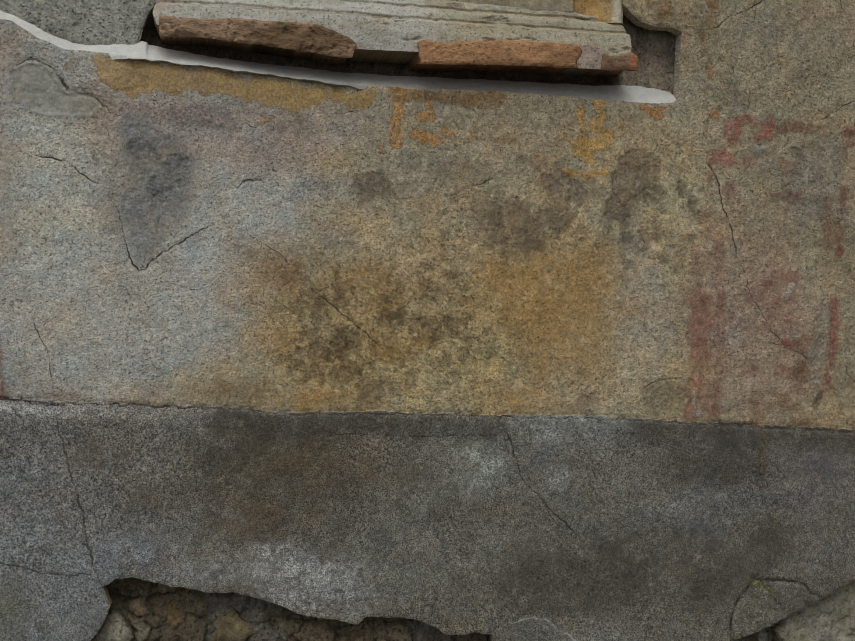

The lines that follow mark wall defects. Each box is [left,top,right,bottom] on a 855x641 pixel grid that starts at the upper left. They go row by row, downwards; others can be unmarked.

crack [36,155,96,183]
crack [706,162,737,254]
crack [126,224,214,271]
crack [745,275,809,360]
crack [248,373,644,532]
crack [668,421,851,433]
crack [0,397,225,585]
flaking render [91,577,491,641]
flaking render [733,580,855,641]